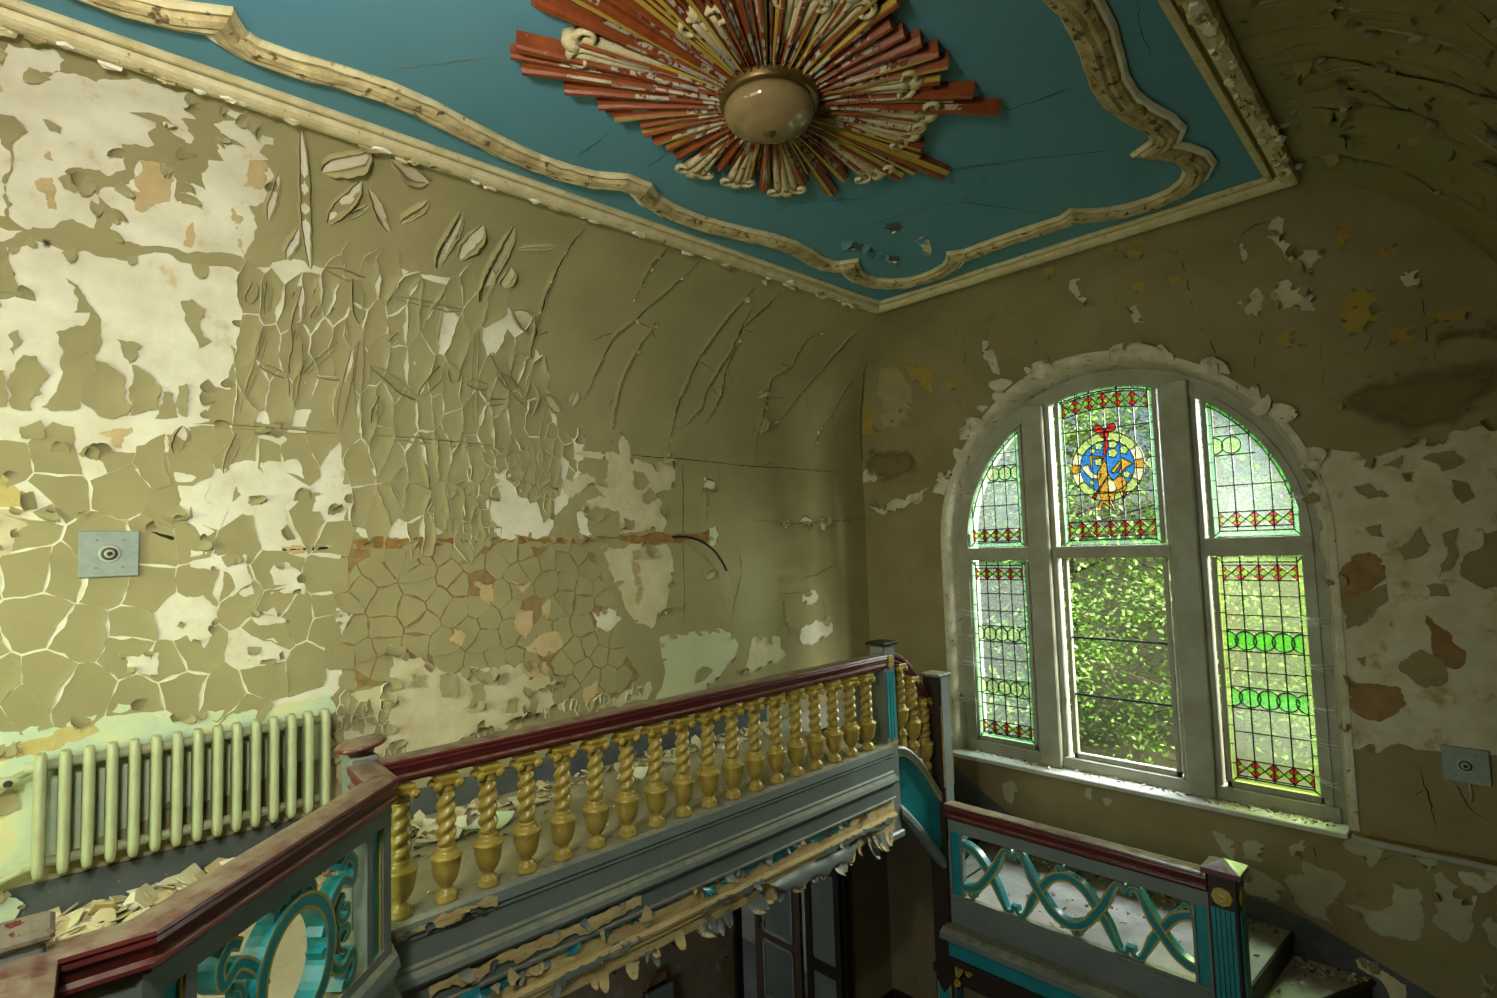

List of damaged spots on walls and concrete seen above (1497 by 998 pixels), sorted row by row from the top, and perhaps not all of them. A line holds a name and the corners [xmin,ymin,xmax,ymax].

crack [529,222,592,361]
peeling [1236,216,1328,317]
crack [145,528,174,540]
crack [282,545,328,553]
peeling [0,26,786,923]
crack [582,247,874,622]
peeling [800,590,833,645]
peeling [861,341,1053,515]
peeling [1292,416,1497,757]
peeling [429,812,894,998]
peeling [1211,830,1497,948]
peeling [1355,958,1407,998]